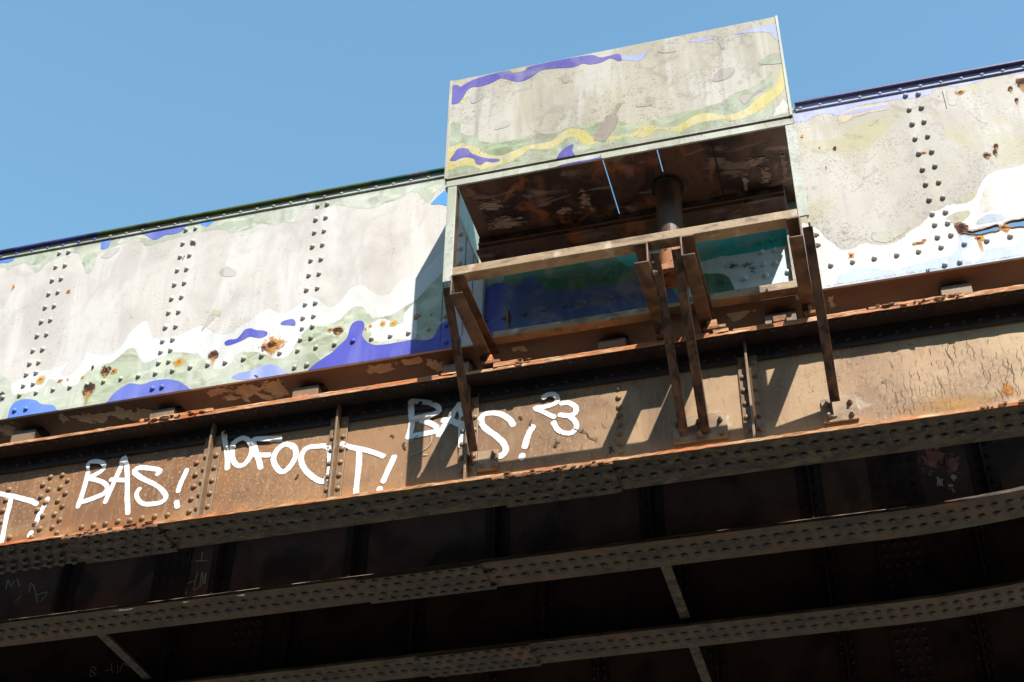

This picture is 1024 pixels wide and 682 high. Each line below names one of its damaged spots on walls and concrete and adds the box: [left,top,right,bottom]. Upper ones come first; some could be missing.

corrosion [956,222,984,247]
corrosion [261,336,287,354]
corrosion [57,365,117,402]
peeling [205,375,289,403]
peeling [366,356,444,374]
crack [847,338,1024,418]
peeling [917,448,962,492]